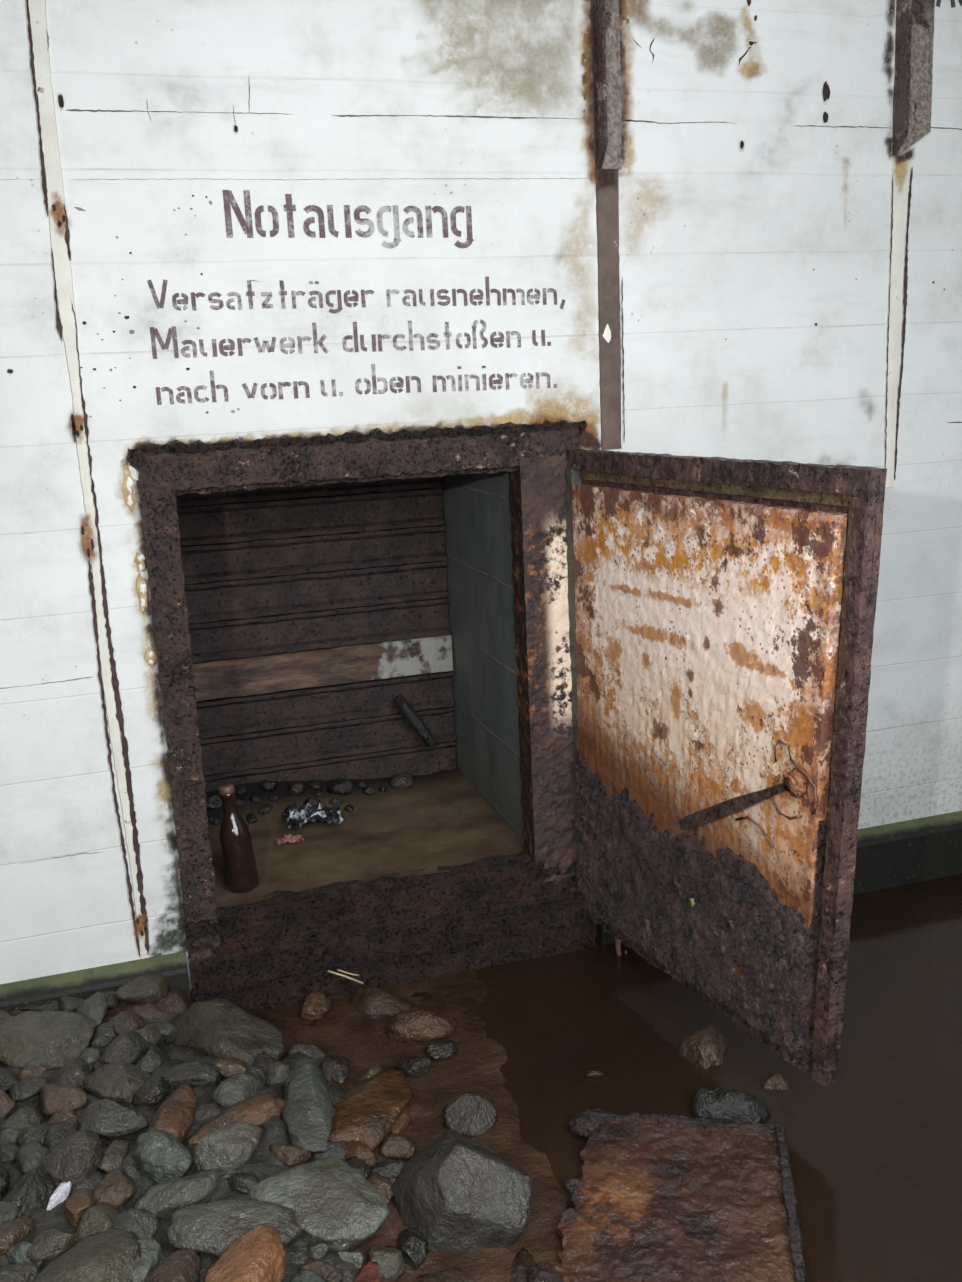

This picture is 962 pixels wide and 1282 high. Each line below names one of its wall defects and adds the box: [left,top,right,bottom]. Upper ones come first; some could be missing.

corrosion [583,0,633,187]
damp [682,28,722,67]
corrosion [742,60,760,77]
corrosion [884,0,895,96]
corrosion [886,138,913,186]
corrosion [124,399,601,943]
corrosion [574,749,827,1057]